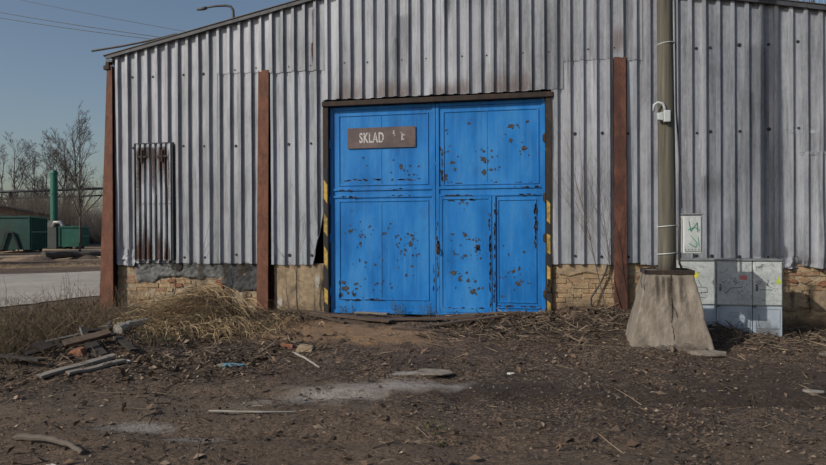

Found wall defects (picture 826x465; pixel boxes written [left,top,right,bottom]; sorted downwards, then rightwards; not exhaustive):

corrosion [137,147,169,196]
peeling [439,145,462,186]
peeling [514,181,539,248]
flaking render [134,262,257,292]
peeling [339,278,393,301]
peeling [344,219,420,277]
peeling [433,203,536,309]